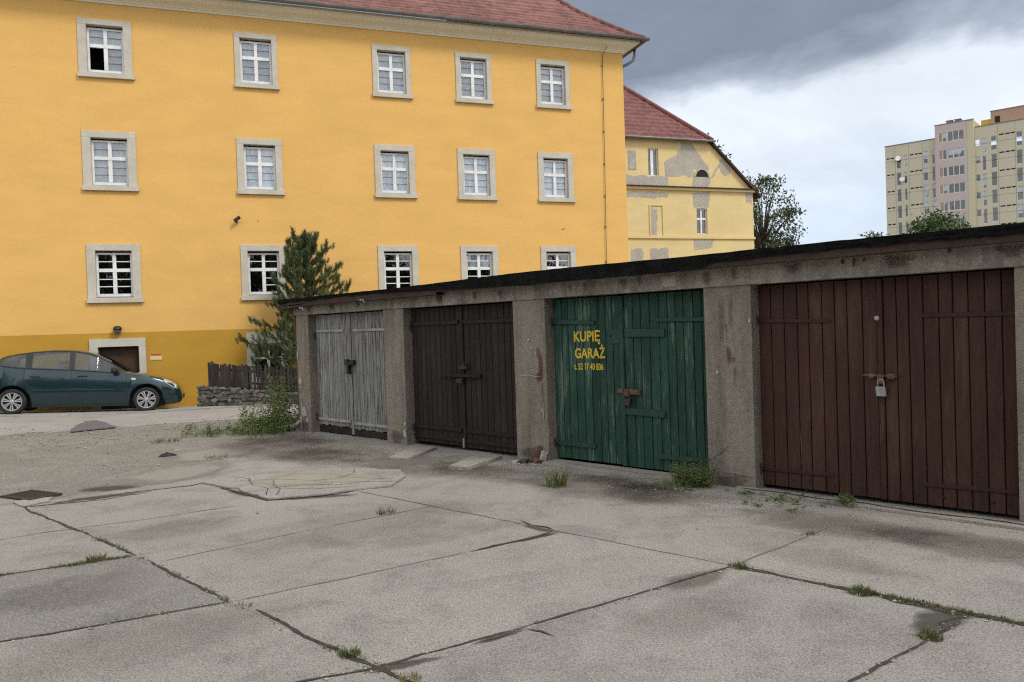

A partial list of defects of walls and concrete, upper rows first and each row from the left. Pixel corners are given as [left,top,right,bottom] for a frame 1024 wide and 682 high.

flaking render [626,143,731,235]
flaking render [631,247,669,261]
crack [231,468,367,495]